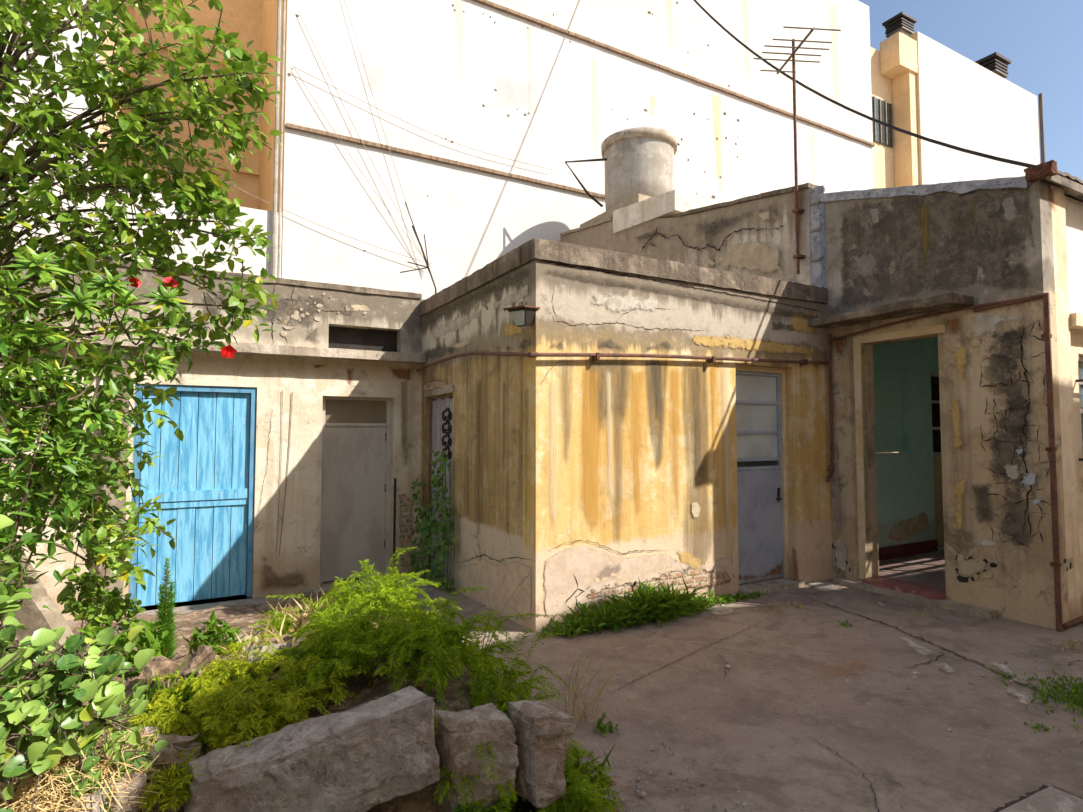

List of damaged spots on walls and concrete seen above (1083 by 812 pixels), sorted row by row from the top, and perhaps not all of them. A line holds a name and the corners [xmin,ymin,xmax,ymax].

peeling [260,292,331,337]
peeling [337,304,370,315]
crack [541,223,819,331]
peeling [693,310,816,356]
leakage [841,187,1034,306]
leakage [551,366,569,519]
leakage [590,341,730,565]
crack [979,318,1050,546]
crack [462,540,670,617]
peeling [460,546,736,619]
flaking render [955,554,998,583]
crack [797,594,1080,706]